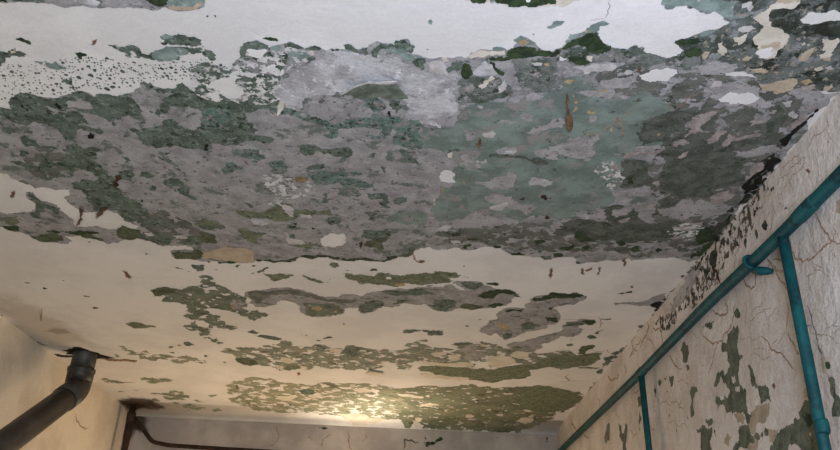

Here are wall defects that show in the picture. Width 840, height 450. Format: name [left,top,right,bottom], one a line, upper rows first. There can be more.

peeling [0,0,216,17]
peeling [467,0,579,8]
peeling [0,21,839,332]
crack [692,212,840,374]
peeling [102,377,222,412]
peeling [150,269,627,433]
crack [593,303,688,437]
peeling [681,341,689,371]
peeling [687,386,698,418]
peeling [696,308,818,450]
peeling [827,375,840,417]